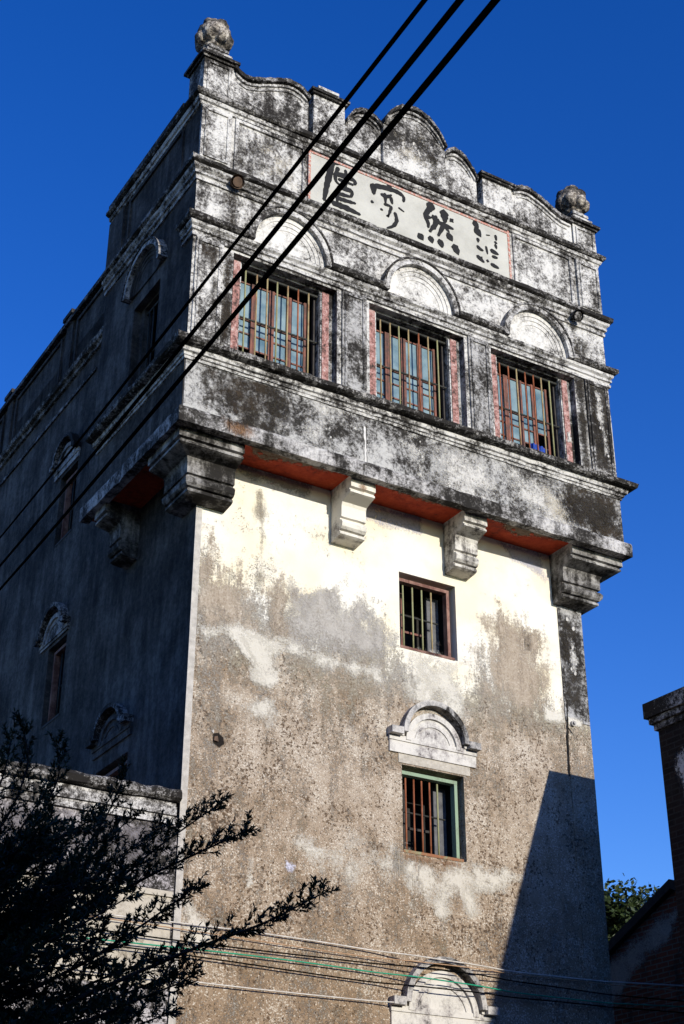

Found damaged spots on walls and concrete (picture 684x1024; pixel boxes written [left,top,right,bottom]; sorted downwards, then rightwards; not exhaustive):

leakage [249,208,332,269]
leakage [202,366,290,433]
leakage [576,380,611,472]
leakage [237,464,312,519]
leakage [366,503,421,534]
leakage [563,484,621,540]
leakage [198,526,294,645]
leakage [504,544,544,577]
leakage [400,658,470,746]
leakage [471,601,581,736]